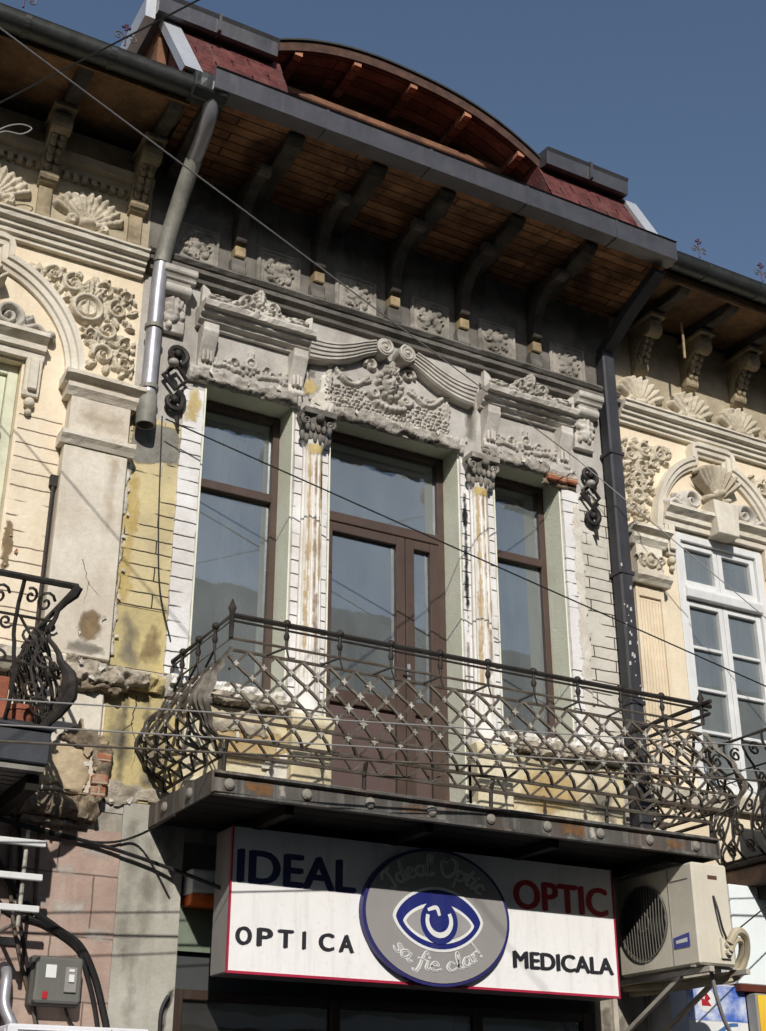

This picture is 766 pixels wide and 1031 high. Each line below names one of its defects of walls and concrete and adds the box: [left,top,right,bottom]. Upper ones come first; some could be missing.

spalling [6,718,174,828]